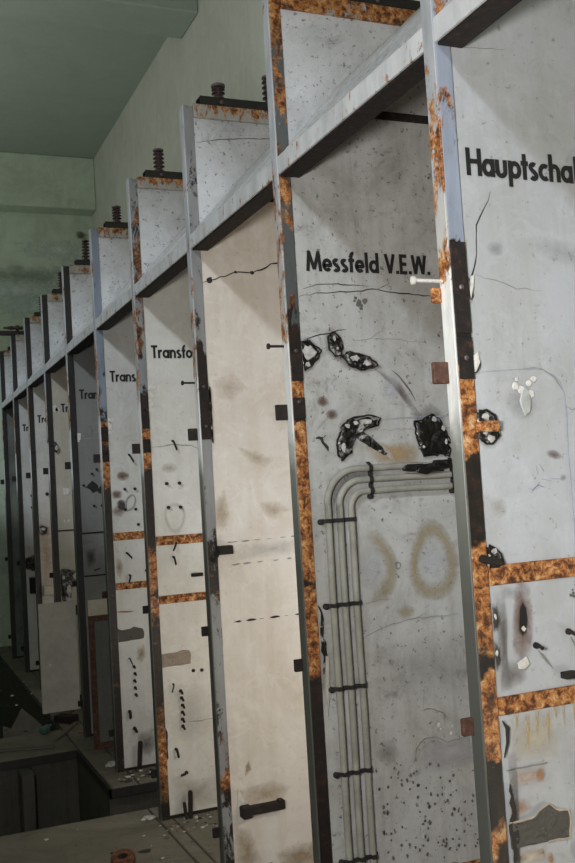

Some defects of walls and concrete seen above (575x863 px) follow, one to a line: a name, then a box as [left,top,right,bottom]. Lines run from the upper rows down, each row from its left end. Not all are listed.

crack [468,194,542,291]
crack [202,262,277,283]
crack [301,283,430,296]
spalling [301,331,379,371]
spalling [336,414,387,461]
spalling [413,414,452,457]